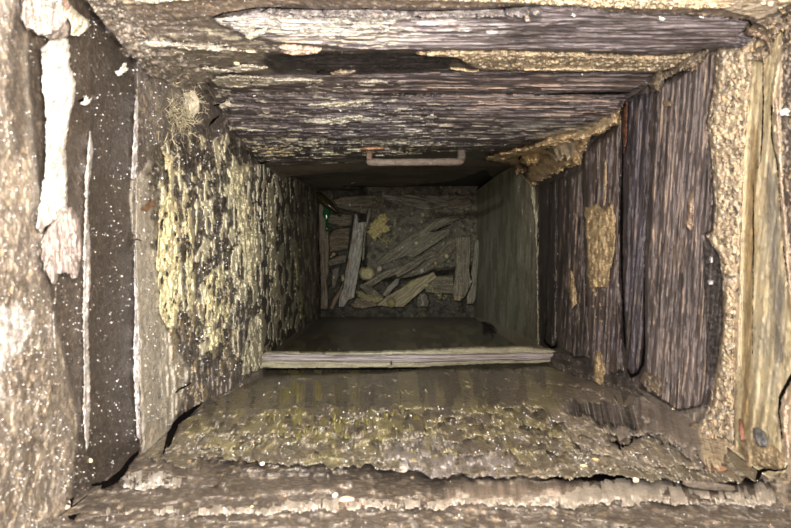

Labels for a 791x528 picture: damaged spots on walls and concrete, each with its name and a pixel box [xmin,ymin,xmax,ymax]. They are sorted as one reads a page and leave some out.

crack [210,6,538,19]
leakage [252,145,294,155]